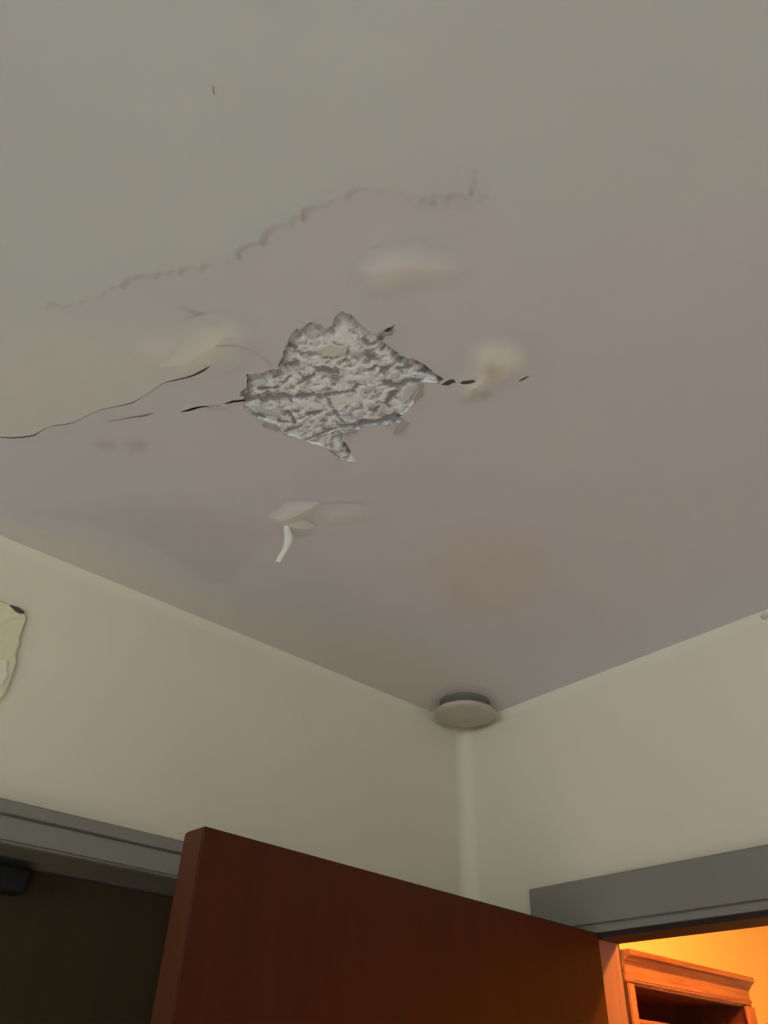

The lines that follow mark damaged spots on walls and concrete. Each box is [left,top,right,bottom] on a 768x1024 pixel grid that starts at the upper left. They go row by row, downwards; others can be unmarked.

crack [0,344,274,439]
flaking render [240,311,443,463]
damp [0,157,768,713]
crack [440,376,477,385]
peeling [268,500,371,536]
peeling [0,600,27,707]